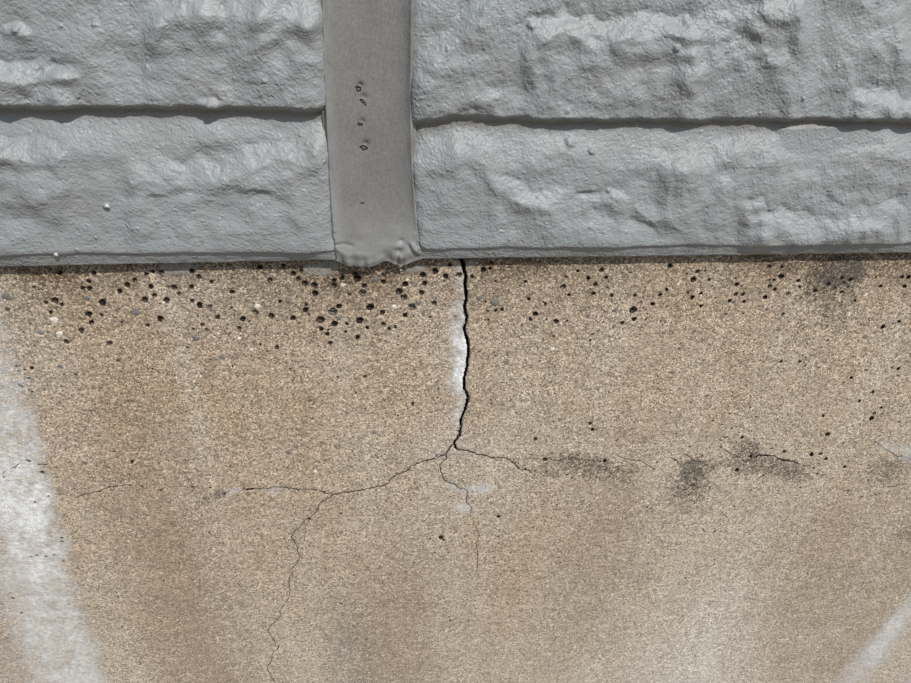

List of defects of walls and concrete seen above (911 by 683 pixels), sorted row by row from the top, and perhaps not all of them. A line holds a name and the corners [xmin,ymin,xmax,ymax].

leakage [0,359,103,683]
crack [223,258,811,683]